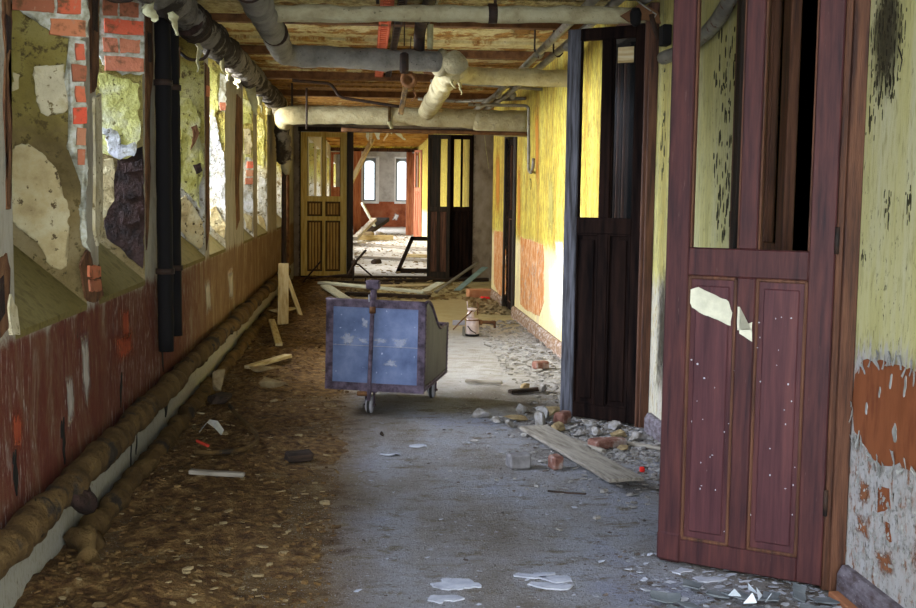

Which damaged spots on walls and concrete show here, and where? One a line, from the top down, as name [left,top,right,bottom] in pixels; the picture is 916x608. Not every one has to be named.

flaking render [1,0,154,303]
water stain [865,0,907,135]
peeling [596,550,842,608]
peeling [846,350,916,608]